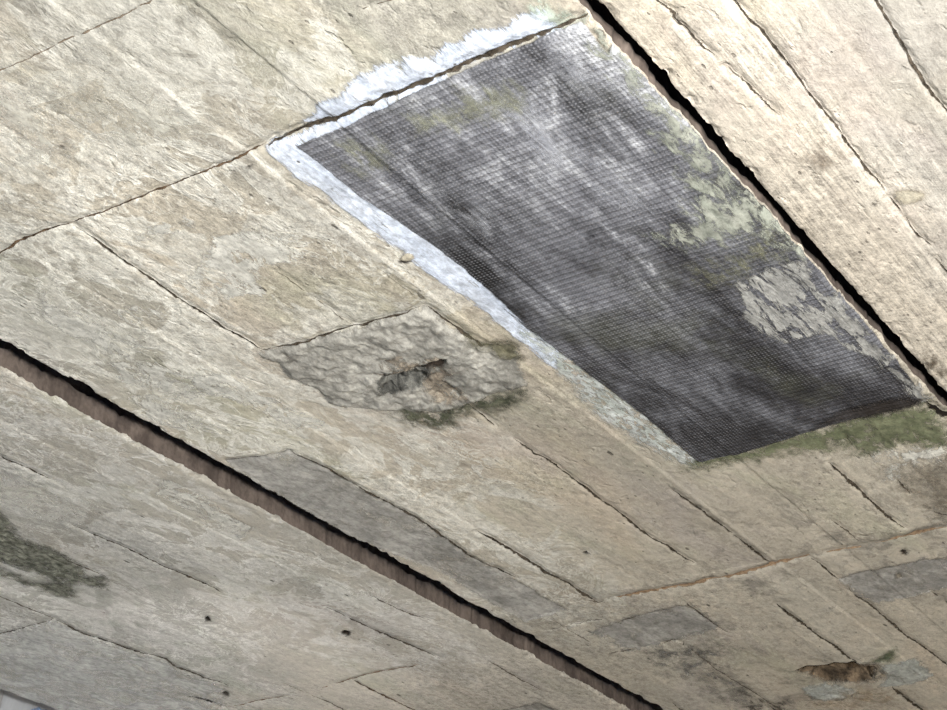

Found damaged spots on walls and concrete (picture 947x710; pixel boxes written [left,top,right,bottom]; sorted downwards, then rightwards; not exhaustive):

spalling [377,356,468,405]
spalling [797,661,887,683]